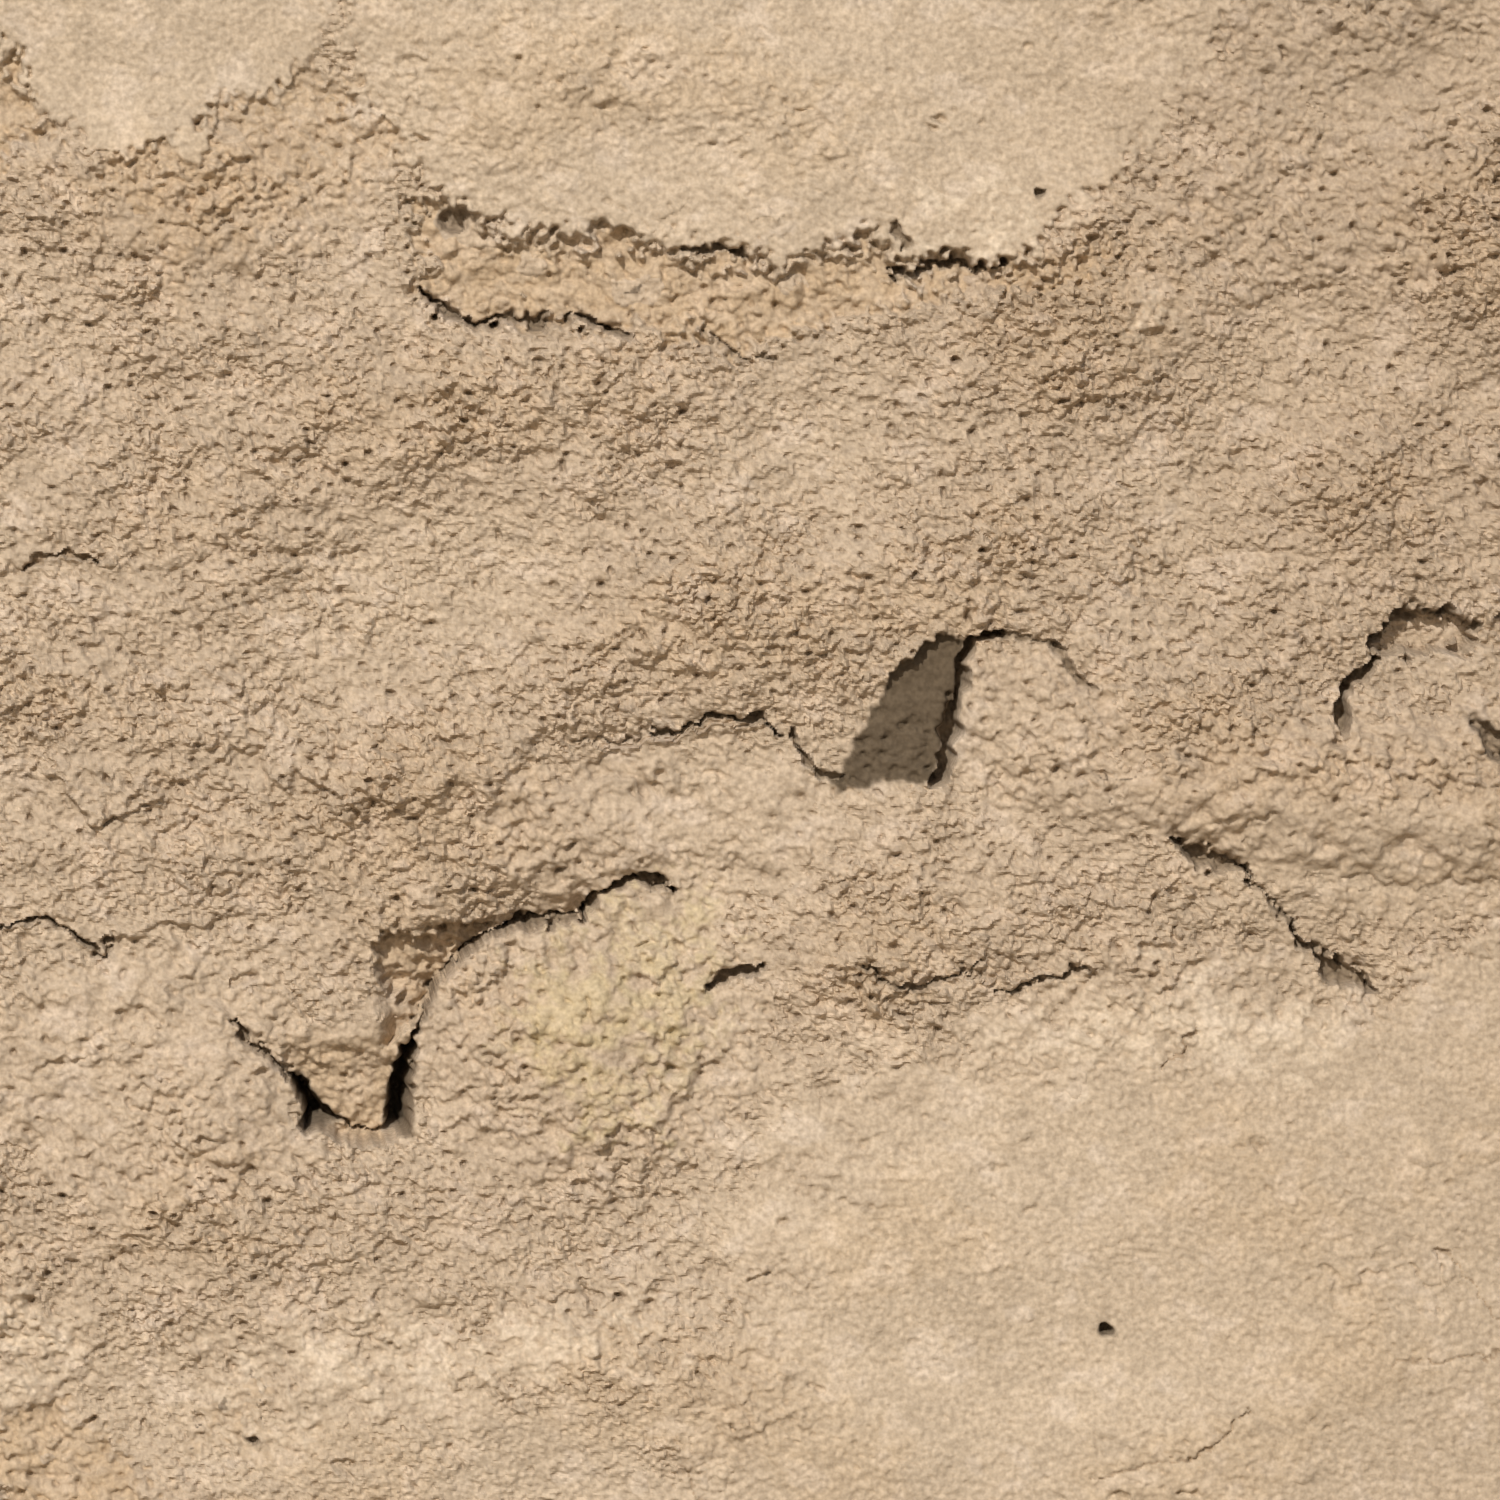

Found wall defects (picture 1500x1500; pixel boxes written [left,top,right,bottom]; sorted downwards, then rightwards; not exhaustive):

crack [678,241,751,260]
crack [886,220,1008,282]
crack [416,285,635,344]
crack [701,326,779,363]
crack [563,710,785,746]
spalling [788,626,1100,797]
crack [0,915,117,960]
crack [1169,836,1379,994]
crack [862,958,1095,995]
crack [229,871,677,1151]